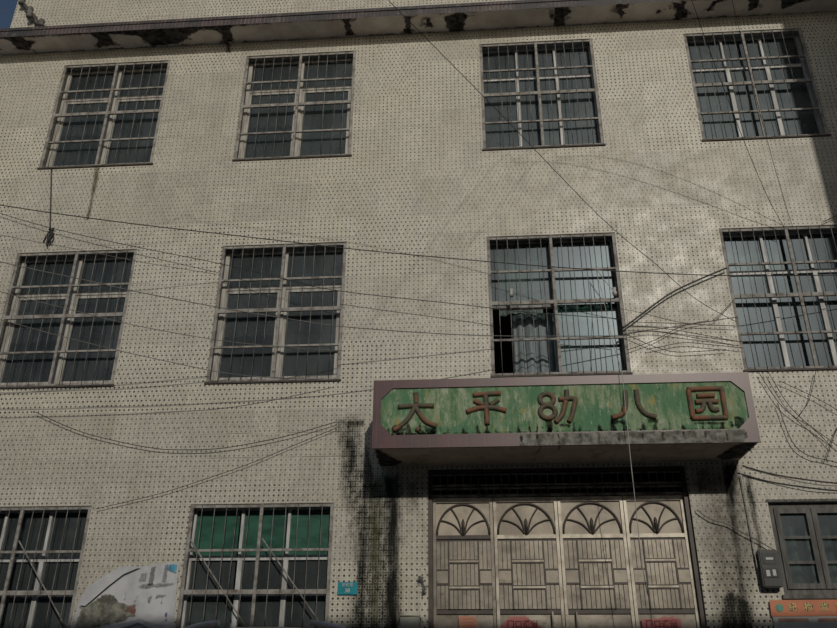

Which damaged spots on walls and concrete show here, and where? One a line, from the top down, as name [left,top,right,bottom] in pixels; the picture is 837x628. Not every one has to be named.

peeling [341,19,357,37]
peeling [404,16,433,34]
peeling [444,13,474,32]
peeling [549,7,572,26]
peeling [615,4,629,19]
peeling [655,1,690,19]
peeling [4,37,35,51]
peeling [91,32,117,48]
peeling [125,25,235,52]
damp [724,464,737,541]
damp [338,421,400,628]
damp [722,588,752,628]